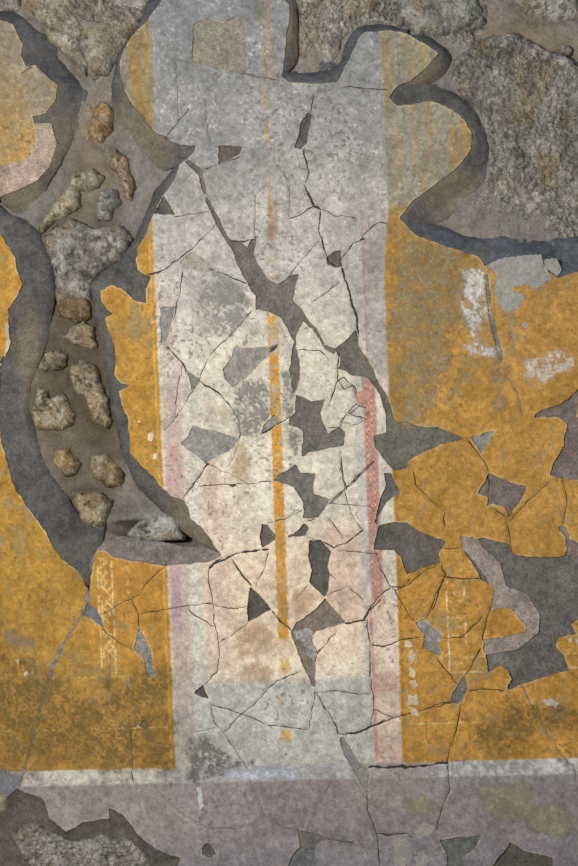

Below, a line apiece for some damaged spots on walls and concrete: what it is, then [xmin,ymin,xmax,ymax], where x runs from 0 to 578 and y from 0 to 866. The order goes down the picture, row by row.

spalling [0,109,57,198]
crack [148,211,215,317]
crack [231,150,388,338]
spalling [447,0,578,238]
crack [166,311,294,497]
crack [300,349,367,428]
spalling [180,158,494,687]
spalling [535,390,578,480]
crack [18,549,269,787]
crack [161,439,578,866]
spalling [460,526,578,689]
spalling [0,788,180,866]